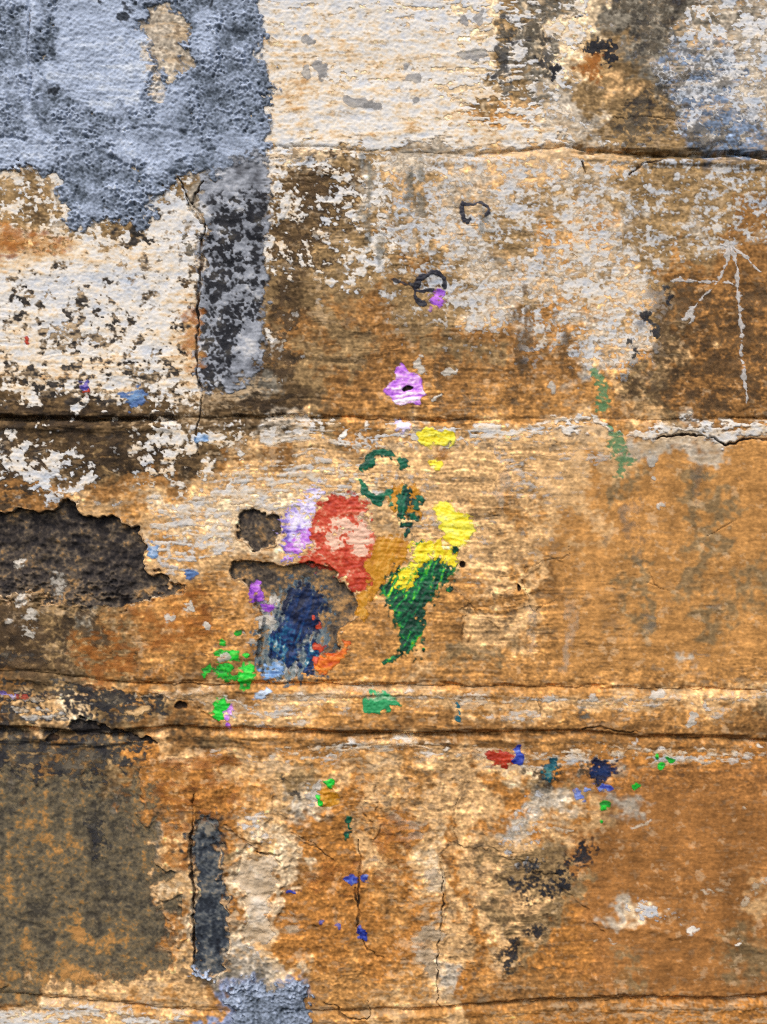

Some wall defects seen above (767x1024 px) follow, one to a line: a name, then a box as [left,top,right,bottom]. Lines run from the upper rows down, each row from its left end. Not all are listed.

crack [178,178,206,382]
peeling [0,166,441,728]
peeling [433,411,767,450]
peeling [487,697,627,721]